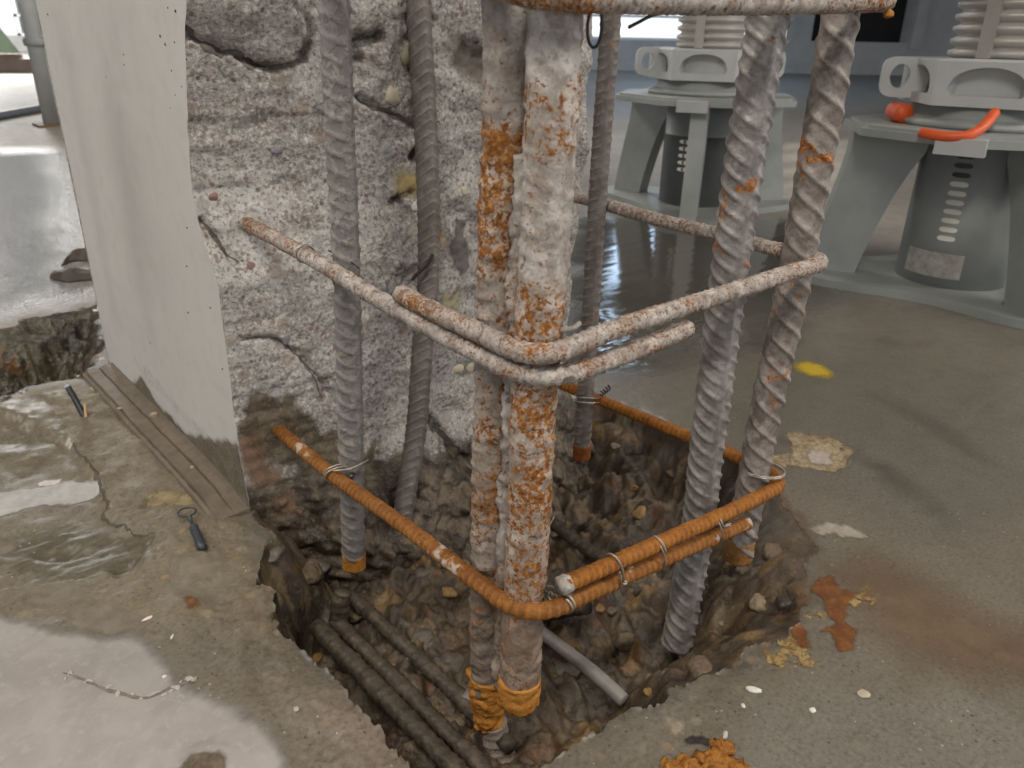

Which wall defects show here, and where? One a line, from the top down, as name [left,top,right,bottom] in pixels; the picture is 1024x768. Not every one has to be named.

crack [185,25,312,70]
crack [199,218,239,262]
crack [241,336,322,400]
spalling [772,432,853,472]
water stain [0,481,103,516]
spalling [544,404,690,600]
spalling [717,458,739,508]
spalling [252,510,471,768]
spalling [348,495,820,768]
corrosion [761,575,876,670]
crack [63,670,198,701]
corrosion [660,736,750,768]